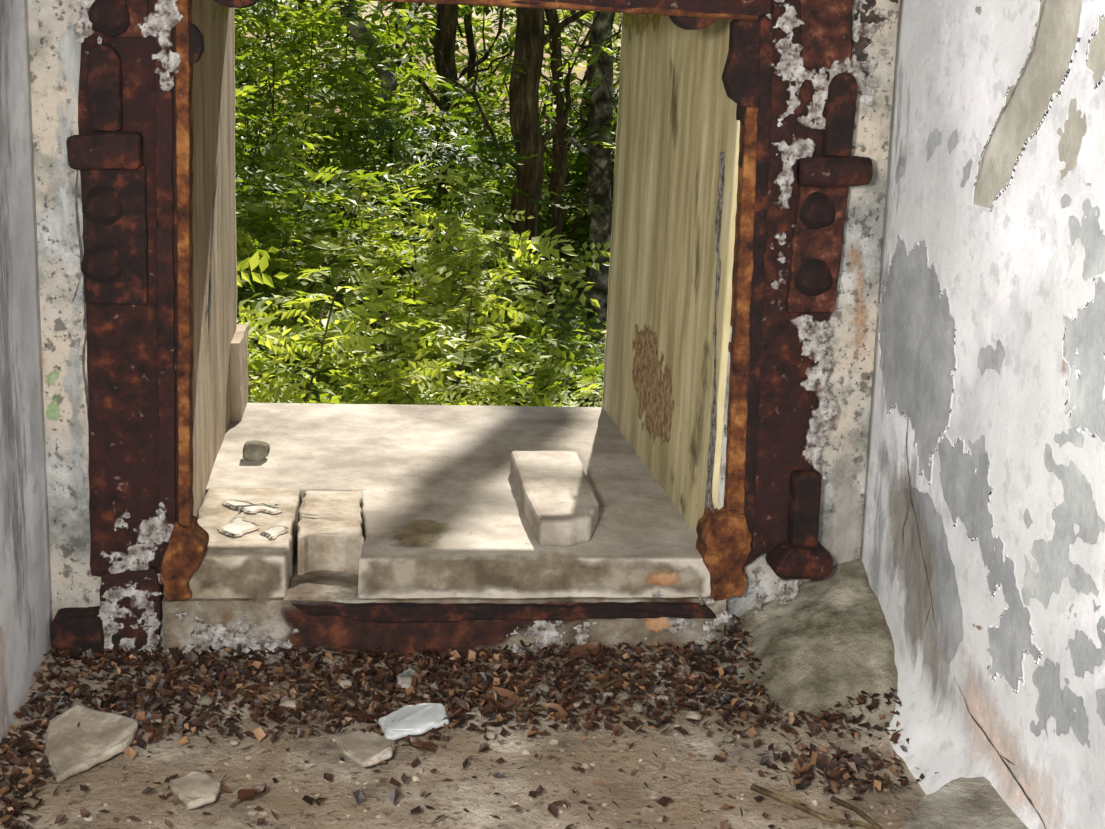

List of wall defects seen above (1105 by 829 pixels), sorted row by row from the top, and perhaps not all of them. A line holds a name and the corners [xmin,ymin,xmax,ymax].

peeling [74,0,102,54]
peeling [843,0,889,156]
spalling [960,0,1105,212]
peeling [895,154,907,184]
peeling [925,128,958,162]
peeling [878,183,1105,748]
peeling [92,500,300,660]
rust [647,572,679,586]
rust [283,609,552,659]
rust [645,617,670,632]